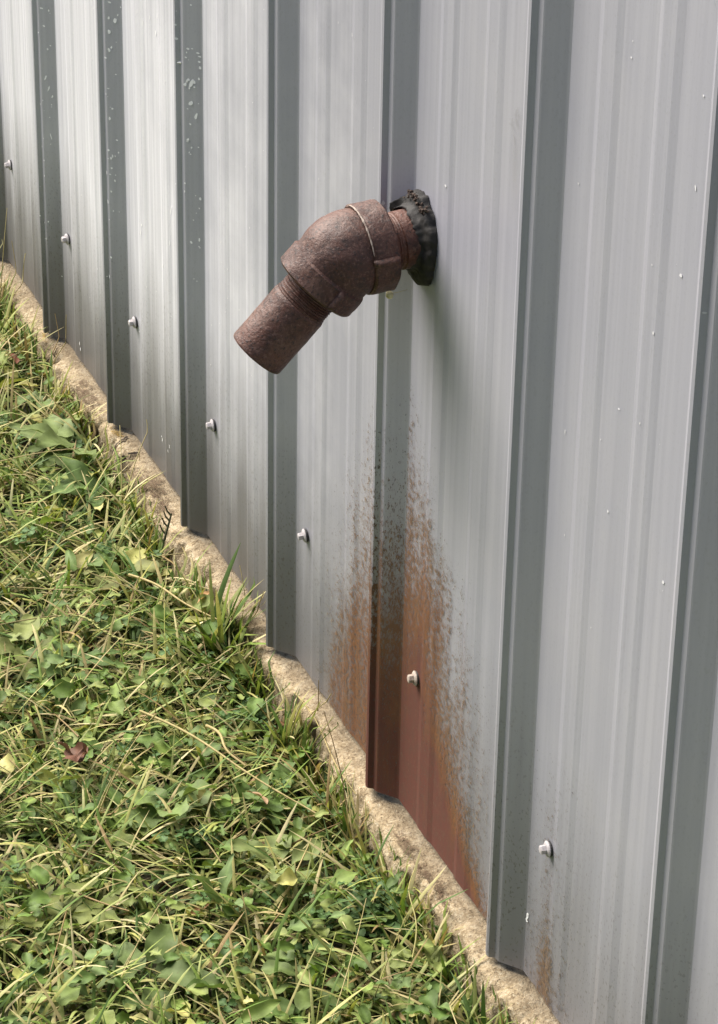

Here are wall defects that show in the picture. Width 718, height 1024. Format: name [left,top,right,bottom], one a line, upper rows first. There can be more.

rust [316,399,491,921]